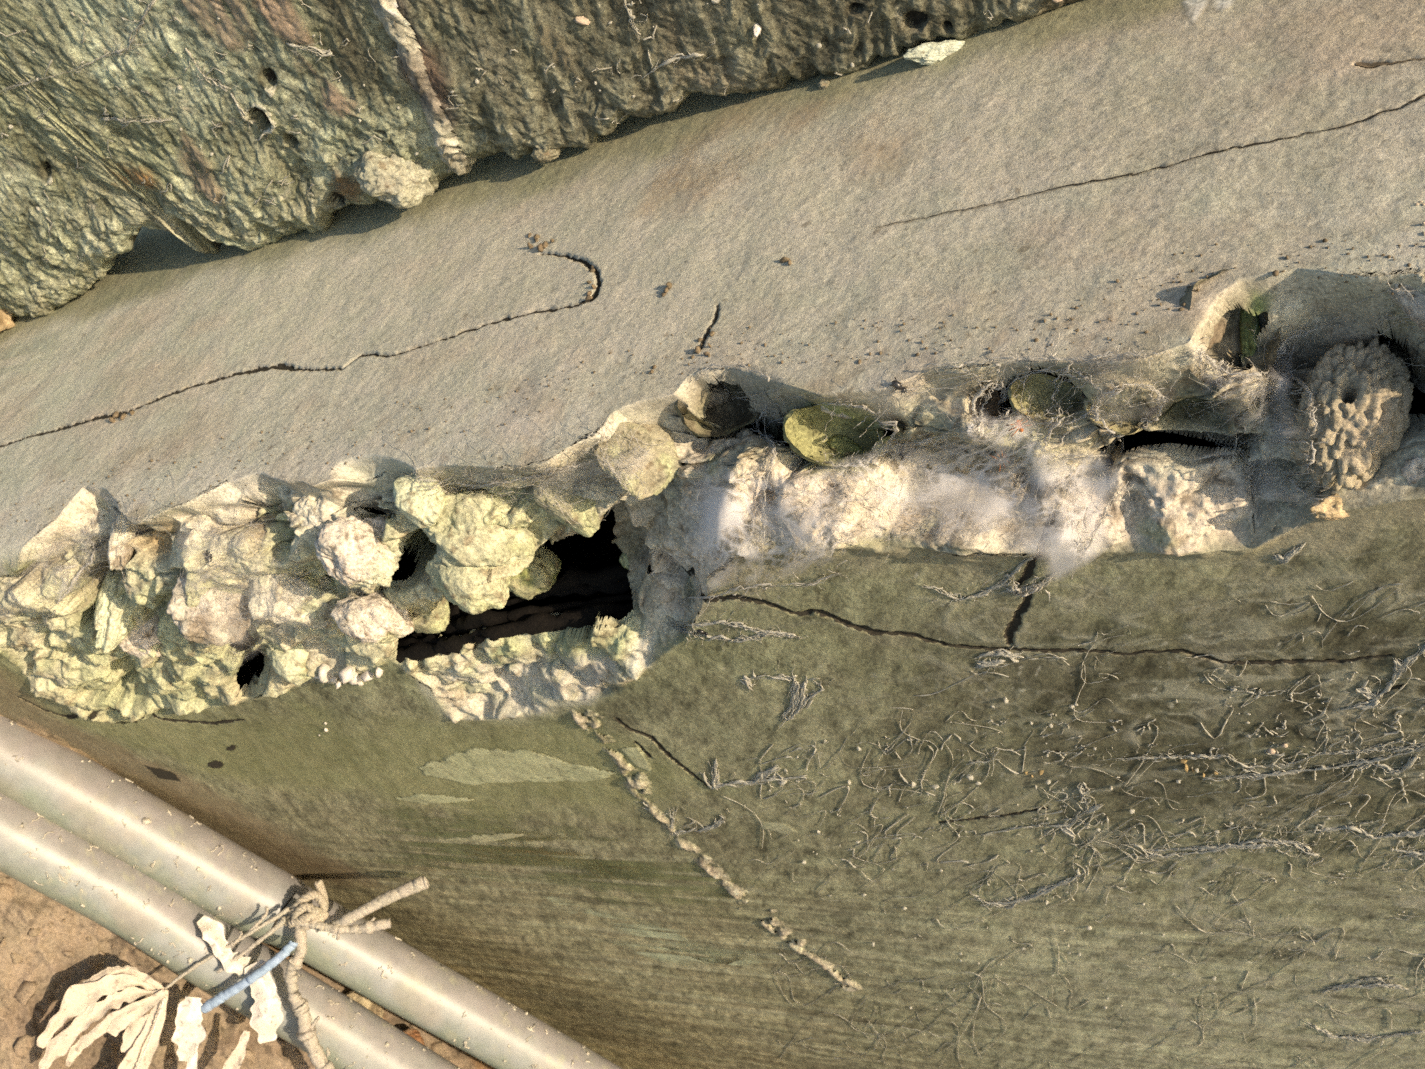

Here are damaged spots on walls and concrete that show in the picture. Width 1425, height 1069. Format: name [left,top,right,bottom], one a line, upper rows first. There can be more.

crack [1356,58,1425,68]
crack [878,94,1425,227]
crack [0,254,602,447]
spalling [0,268,1425,724]
crack [682,513,1403,700]